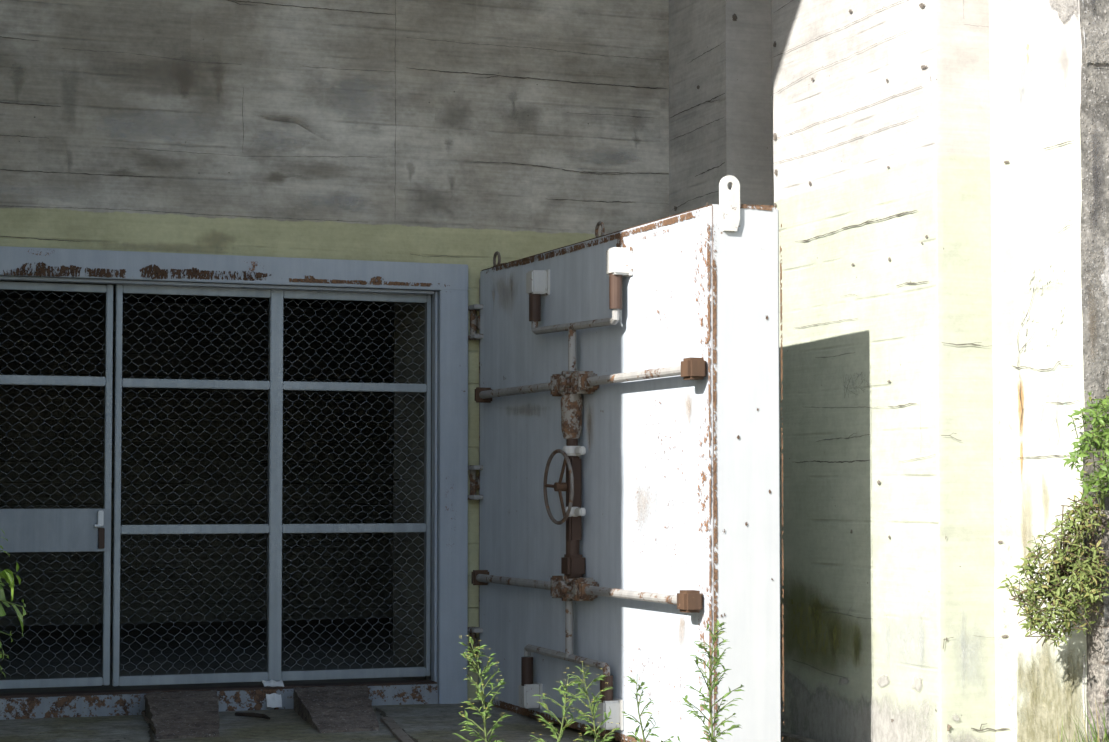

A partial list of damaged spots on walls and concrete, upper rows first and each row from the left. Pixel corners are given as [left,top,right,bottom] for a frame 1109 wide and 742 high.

spalling [1049,0,1078,23]
rust [3,249,126,278]
rust [140,261,271,281]
rust [289,275,450,287]
rust [485,205,734,742]